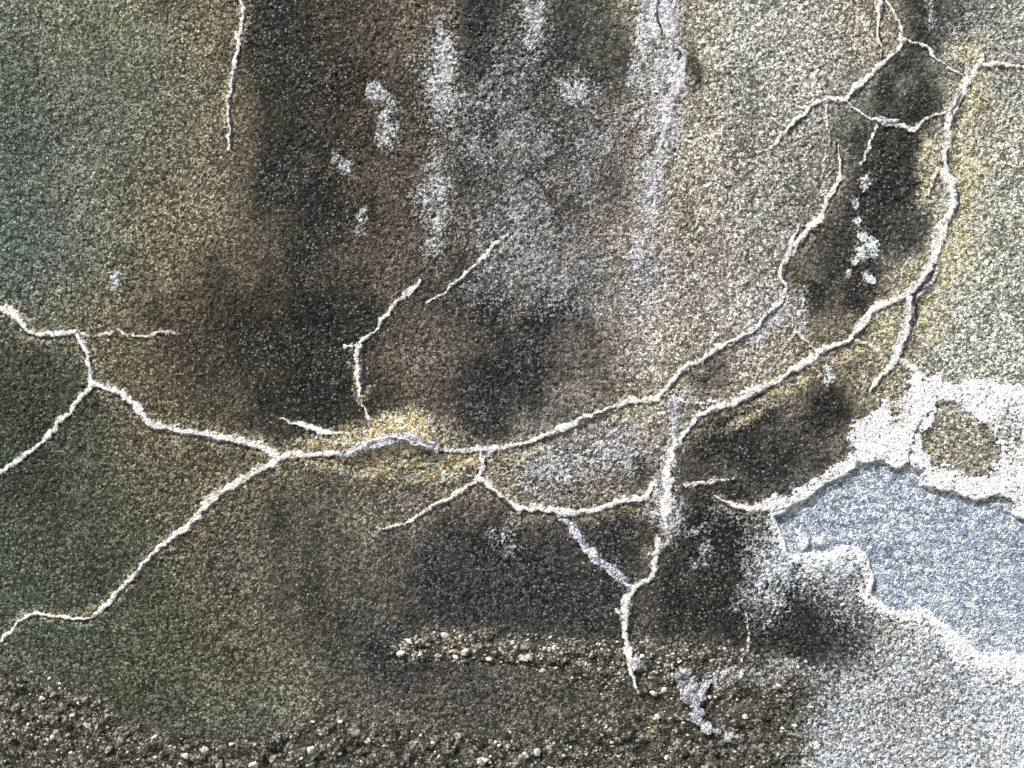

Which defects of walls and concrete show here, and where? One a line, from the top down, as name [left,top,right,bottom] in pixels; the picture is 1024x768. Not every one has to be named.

crack [225,0,246,151]
water stain [139,0,688,449]
crack [0,136,844,643]
crack [635,0,682,154]
crack [741,613,750,662]
crack [676,0,1024,448]
water stain [742,0,1000,348]
peeling [741,364,1024,690]